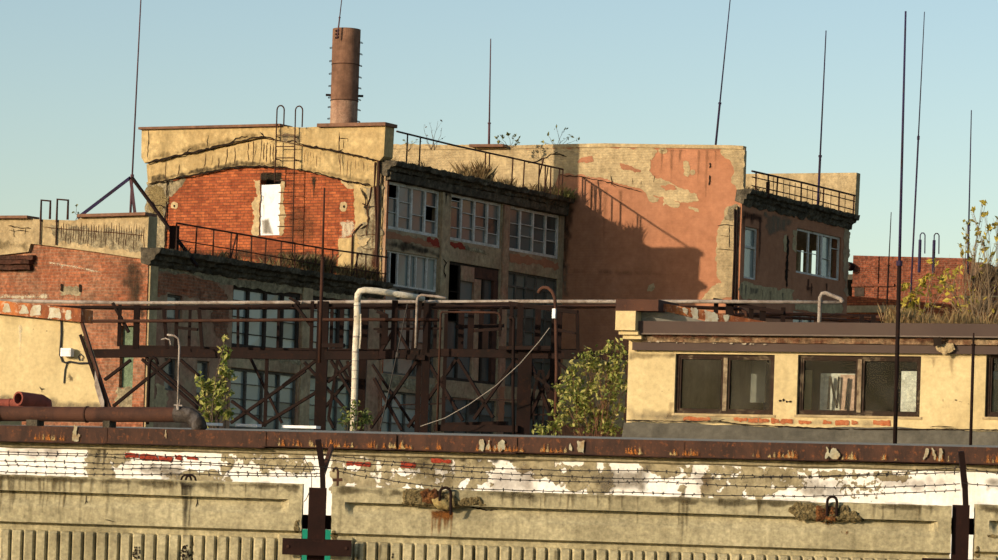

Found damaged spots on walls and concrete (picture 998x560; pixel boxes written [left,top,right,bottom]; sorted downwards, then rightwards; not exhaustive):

crack [10,131,375,255]
spalling [355,186,487,268]
peeling [391,144,699,212]
peeling [702,204,740,300]
peeling [795,228,851,313]
spalling [733,417,858,426]
peeling [84,450,314,482]
corrosion [432,508,453,528]
peeling [511,460,616,495]
peeling [639,463,912,522]